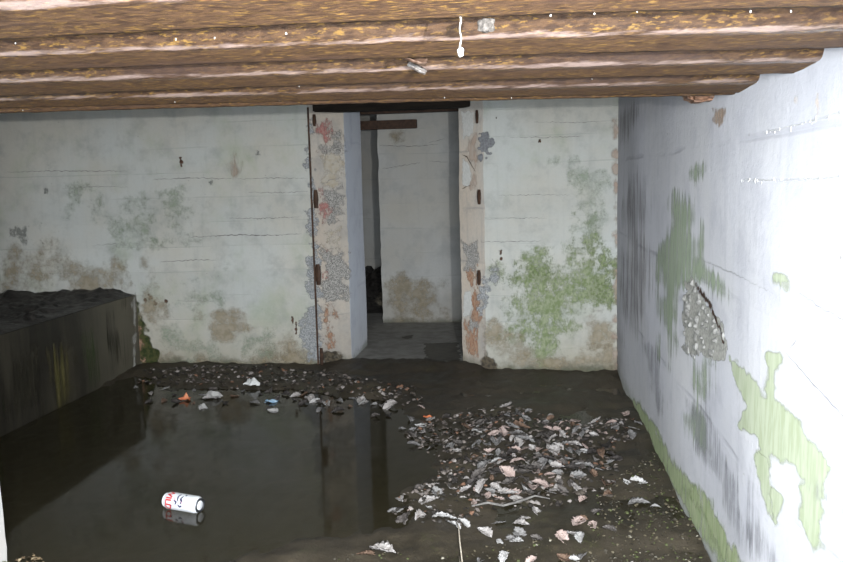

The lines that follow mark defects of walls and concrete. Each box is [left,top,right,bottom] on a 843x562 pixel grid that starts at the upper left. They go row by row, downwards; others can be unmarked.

spalling [461,111,495,162]
peeling [462,159,471,186]
water stain [4,227,27,289]
water stain [70,263,124,290]
water stain [211,310,249,342]
water stain [253,341,312,364]
spalling [298,177,351,362]
spalling [463,266,500,331]
water stain [515,323,614,368]
spalling [682,277,728,361]
water stain [755,452,783,524]